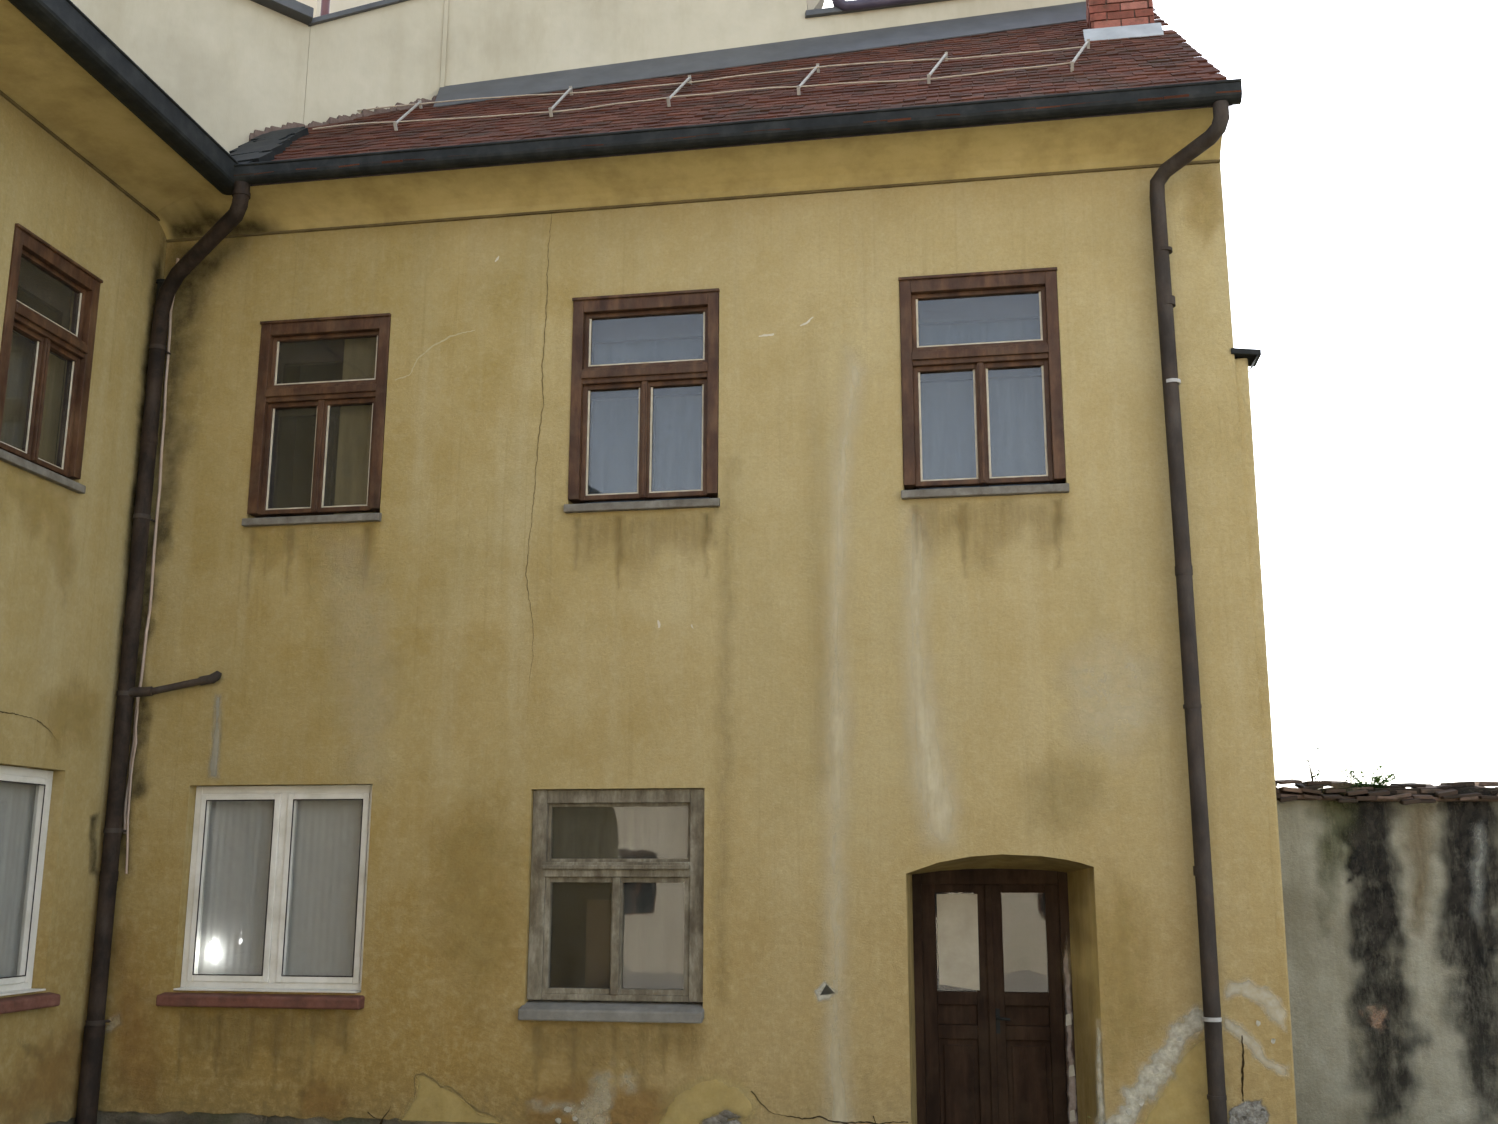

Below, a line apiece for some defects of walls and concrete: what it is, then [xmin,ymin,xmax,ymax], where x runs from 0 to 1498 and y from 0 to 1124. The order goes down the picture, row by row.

leakage [164,212,267,439]
crack [525,213,552,683]
leakage [127,262,169,797]
leakage [916,658,948,837]
crack [367,1073,503,1124]
spalling [702,1109,741,1124]
crack [751,1091,908,1124]
peeling [1098,1009,1204,1124]
spalling [1229,1100,1269,1124]
peeling [1225,981,1285,1074]